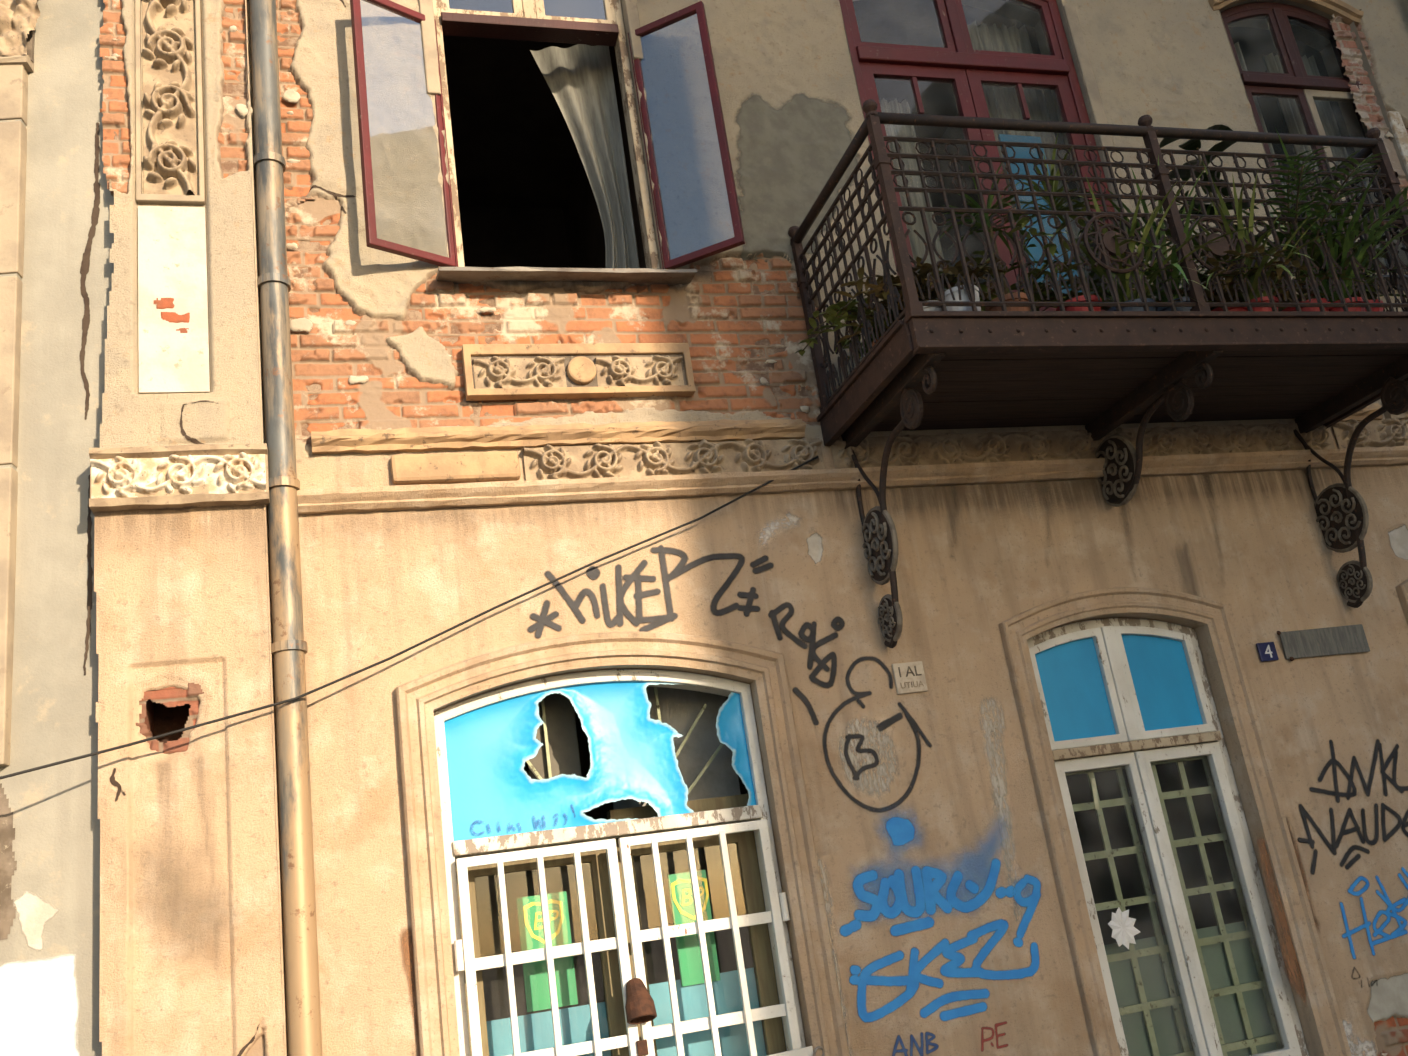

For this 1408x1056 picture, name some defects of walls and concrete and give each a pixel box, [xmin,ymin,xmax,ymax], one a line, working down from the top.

flaking render [1330,14,1408,209]
crack [79,122,100,420]
flaking render [154,298,190,333]
flaking render [276,0,821,439]
crack [83,475,93,675]
spalling [136,683,204,754]
spalling [0,783,58,950]
crack [237,1025,259,1056]
peeling [1367,973,1408,1056]